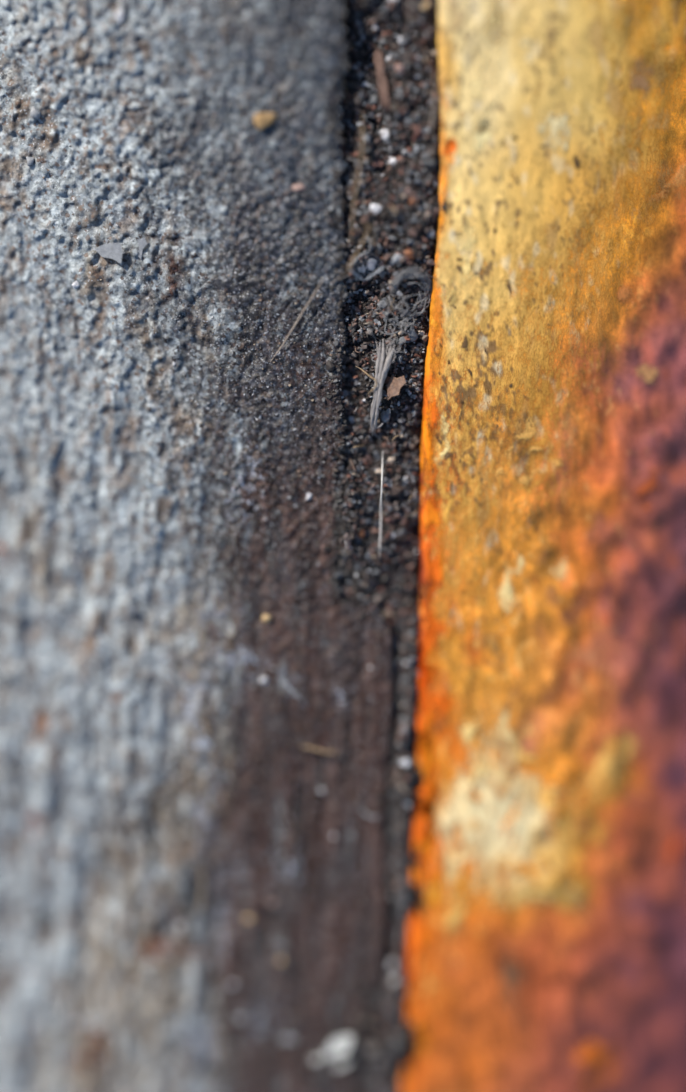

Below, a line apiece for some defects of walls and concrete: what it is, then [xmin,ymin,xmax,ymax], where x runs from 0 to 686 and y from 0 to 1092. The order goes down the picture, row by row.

leakage [123,0,349,952]
corrosion [402,275,453,1089]
corrosion [443,139,457,155]